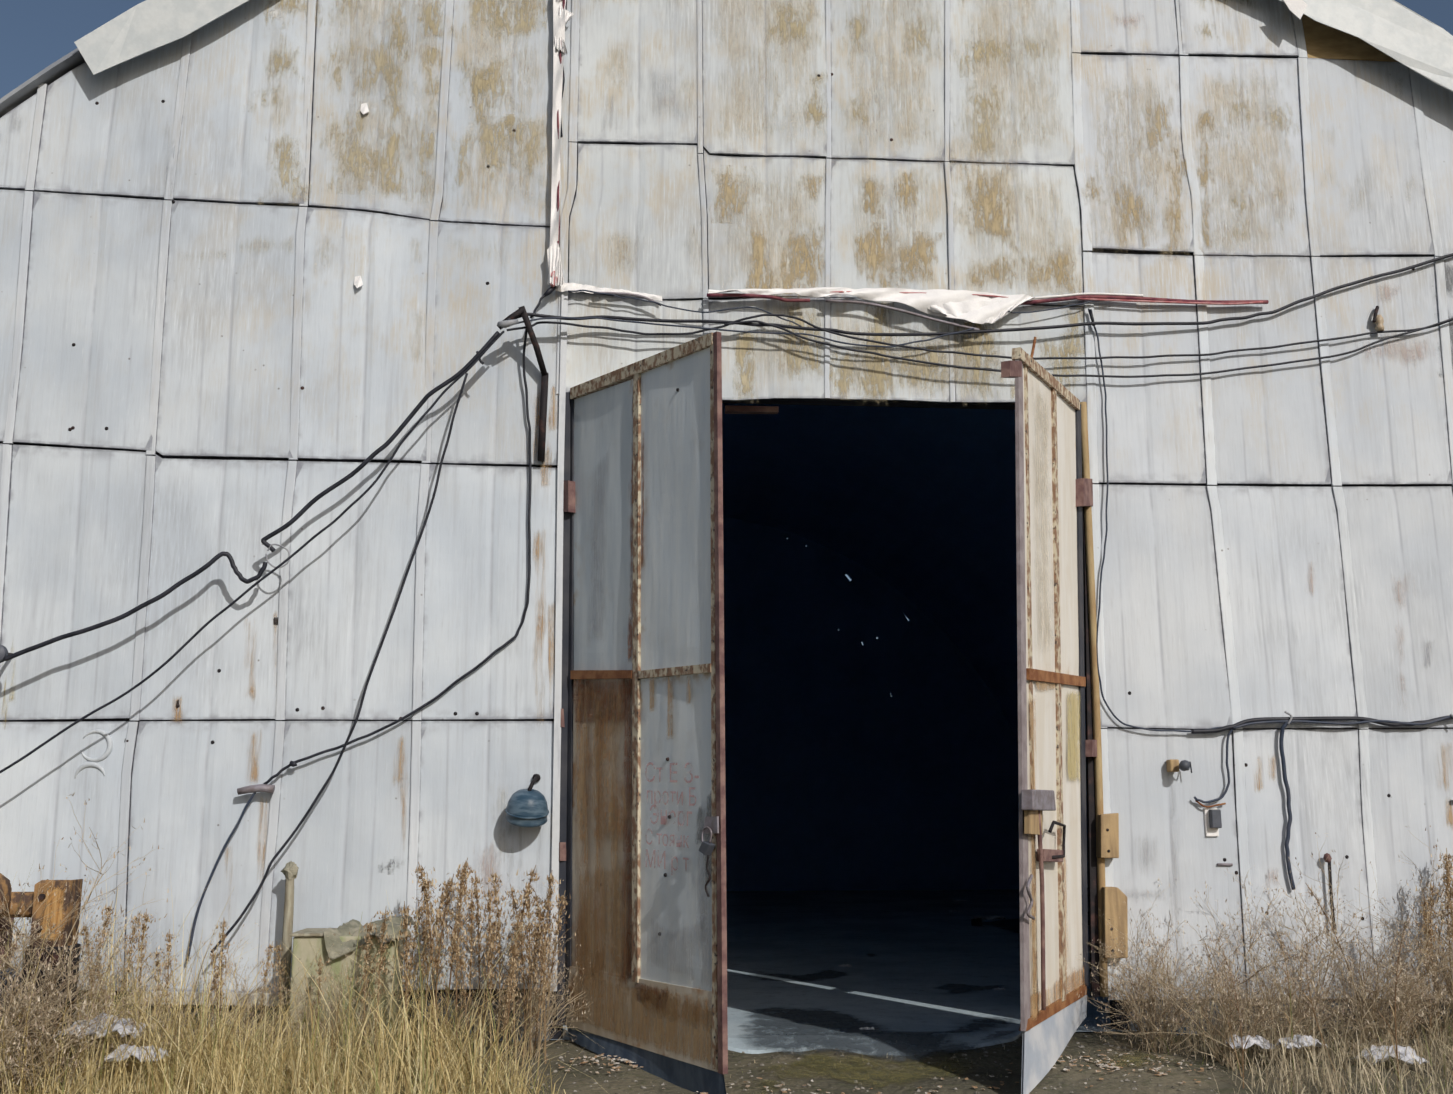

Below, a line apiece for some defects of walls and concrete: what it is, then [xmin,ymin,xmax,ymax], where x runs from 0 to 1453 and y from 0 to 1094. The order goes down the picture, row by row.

peeling [333,4,405,192]
peeling [420,2,441,94]
peeling [459,60,543,182]
peeling [472,0,545,38]
peeling [968,173,1011,237]
peeling [1167,113,1213,251]
corrosion [628,438,644,661]
corrosion [538,608,555,672]
corrosion [650,677,691,737]
corrosion [1030,681,1080,790]
corrosion [573,679,632,986]
corrosion [1031,834,1084,1019]